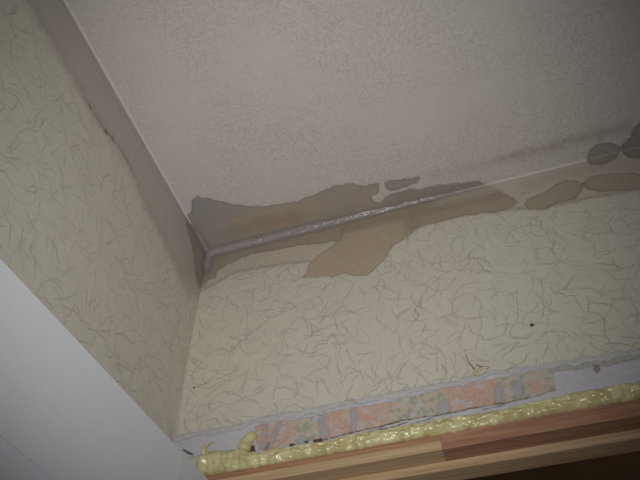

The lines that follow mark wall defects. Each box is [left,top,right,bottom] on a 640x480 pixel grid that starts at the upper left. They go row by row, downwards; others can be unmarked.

water stain [187,177,516,287]
water stain [525,173,640,210]
water stain [588,123,640,164]
peeling [172,349,640,458]